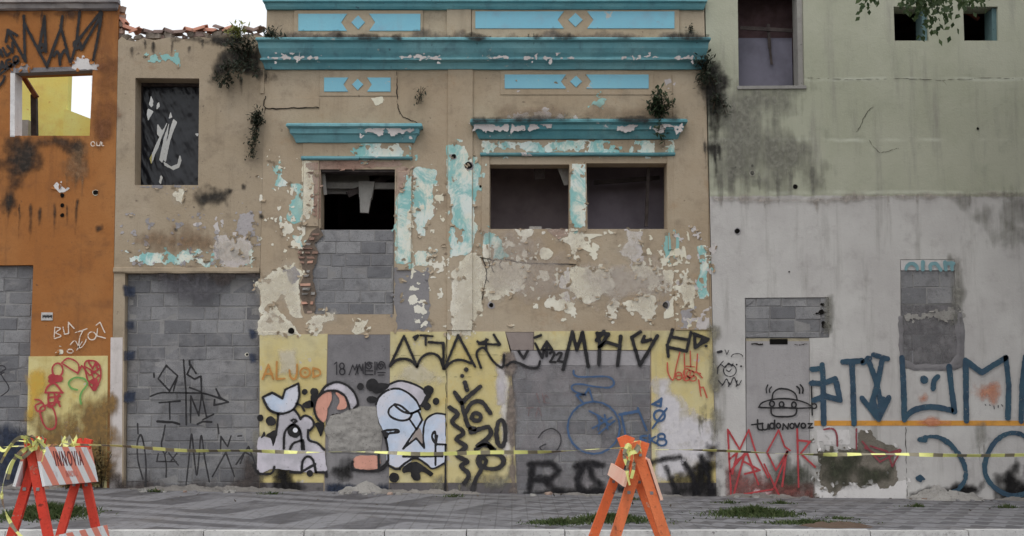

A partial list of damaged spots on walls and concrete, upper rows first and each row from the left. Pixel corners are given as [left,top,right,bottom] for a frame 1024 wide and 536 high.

peeling [399,53,441,64]
leakage [701,63,811,187]
leakage [2,137,86,220]
leakage [196,185,245,205]
peeling [120,107,717,340]
spalling [809,426,911,499]